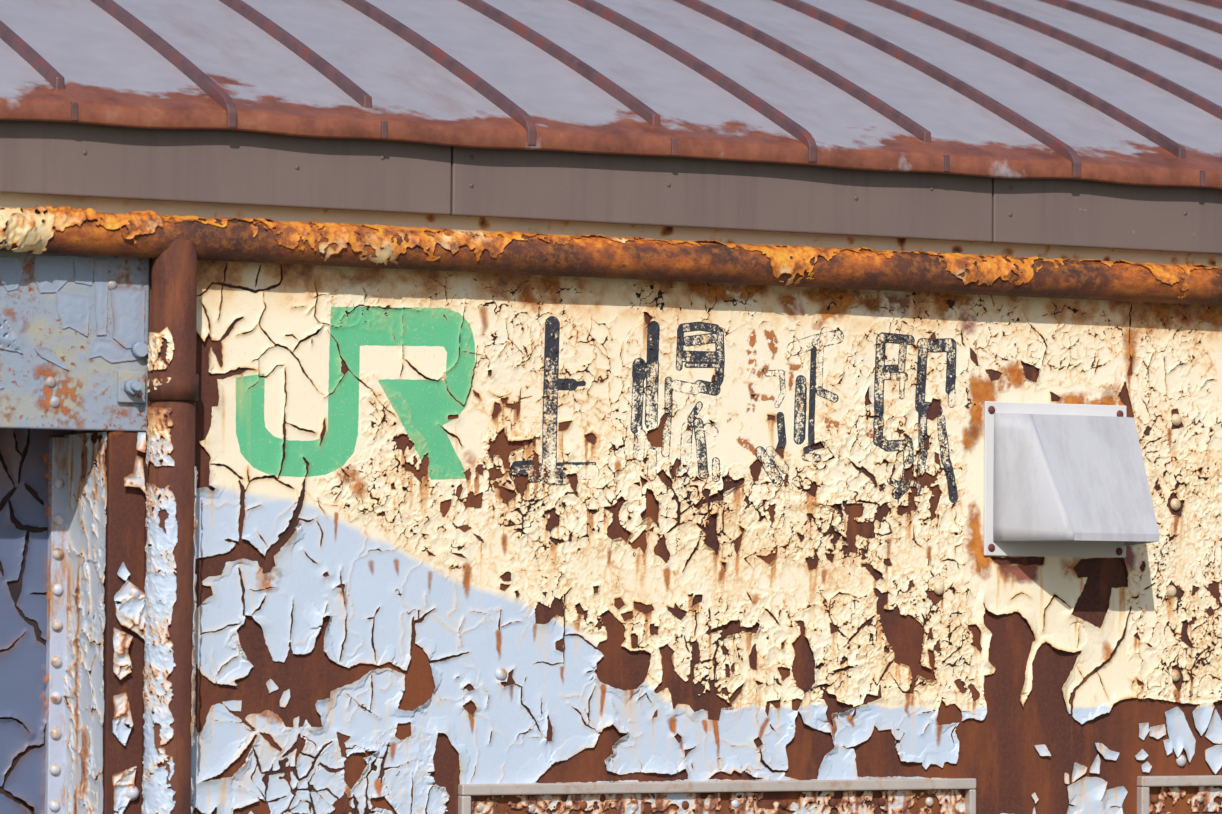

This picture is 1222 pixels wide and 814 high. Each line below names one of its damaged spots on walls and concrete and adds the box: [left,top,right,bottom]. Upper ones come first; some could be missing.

rust [518,286,534,304]
rust [690,284,765,302]
rust [779,289,909,327]
rust [937,293,974,332]
rust [963,364,1025,449]
crack [0,428,48,652]
peeling [0,206,1222,814]
crack [191,262,1222,814]
rust [967,504,1037,582]